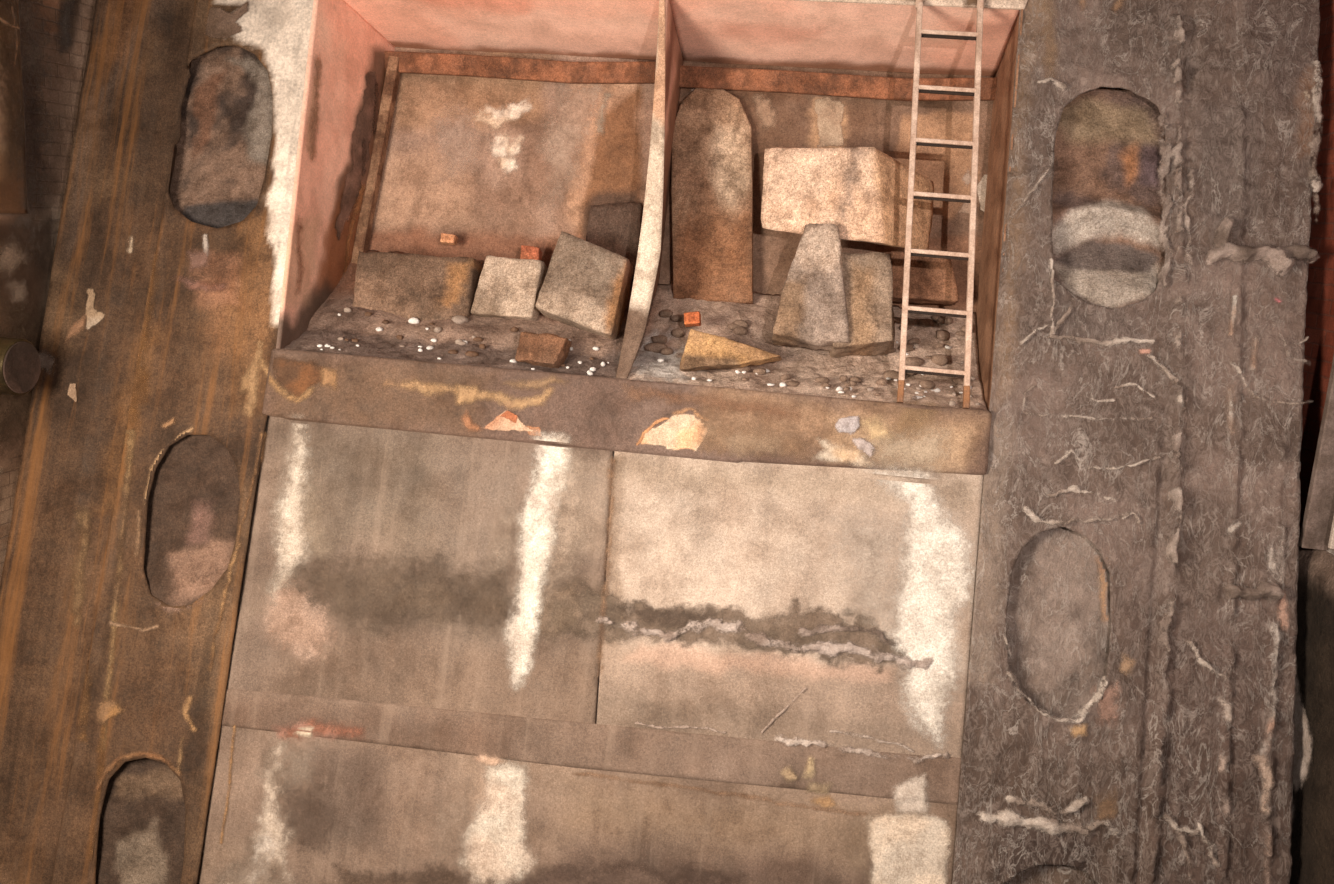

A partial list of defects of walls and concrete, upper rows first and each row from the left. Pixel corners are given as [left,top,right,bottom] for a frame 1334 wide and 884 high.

damp [441,100,531,171]
damp [541,87,610,187]
crack [1231,364,1304,405]
peeling [463,411,542,437]
peeling [636,408,803,454]
peeling [819,416,941,468]
damp [265,423,973,884]